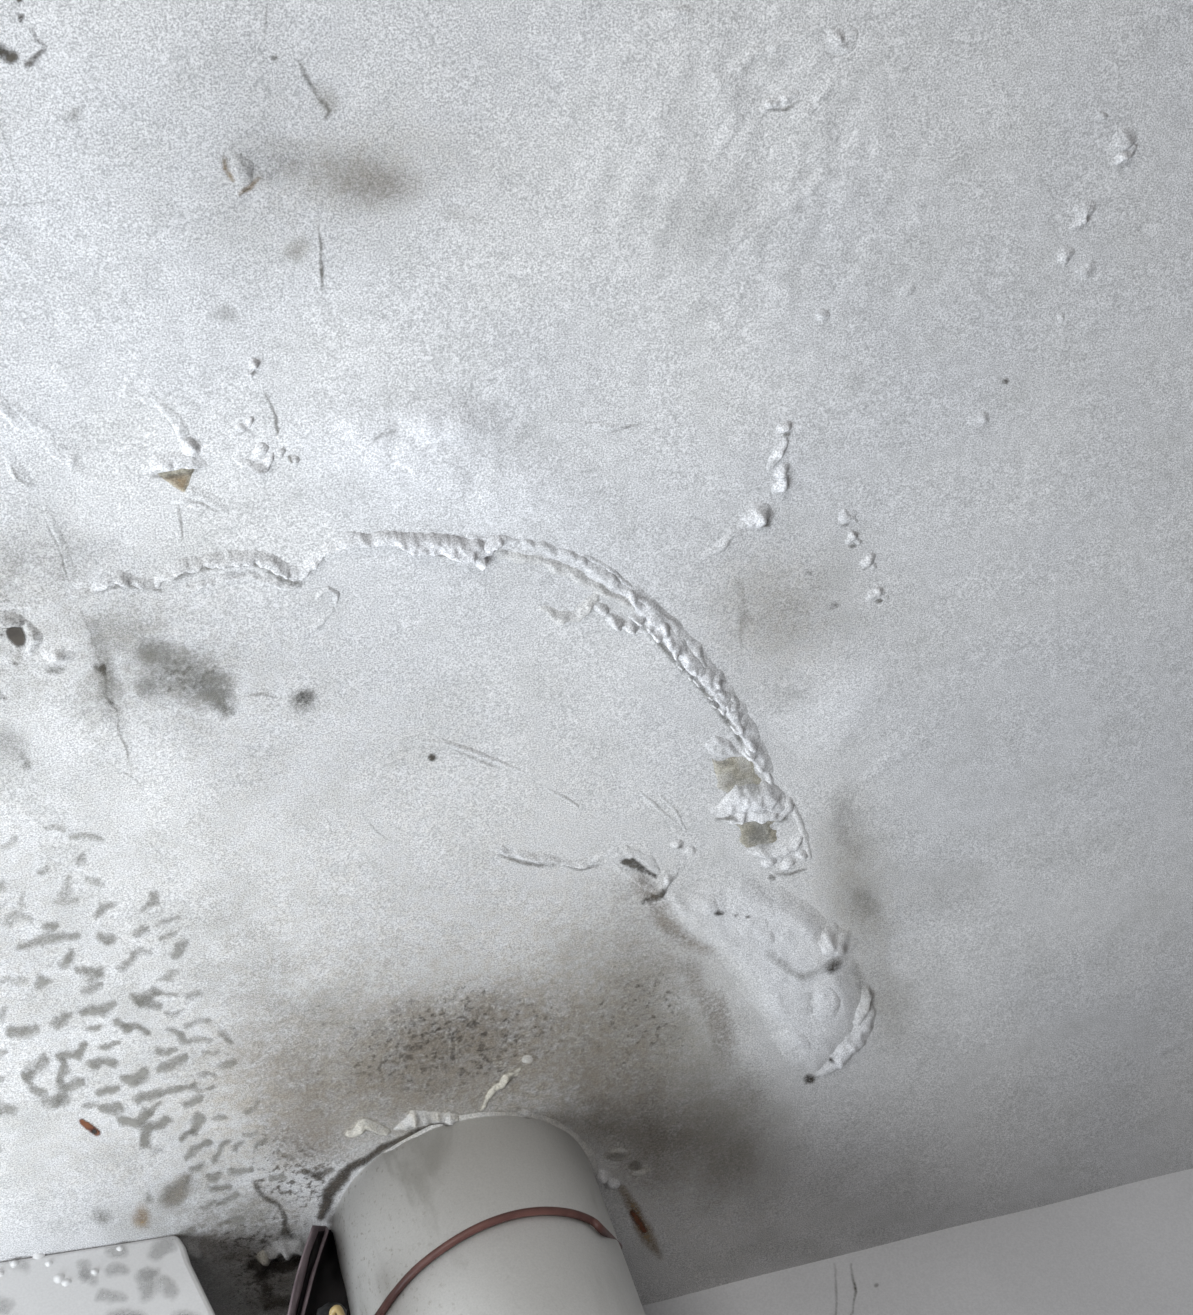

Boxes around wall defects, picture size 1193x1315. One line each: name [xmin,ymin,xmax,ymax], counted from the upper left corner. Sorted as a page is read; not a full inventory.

peeling [246,358,260,378]
spalling [142,393,230,517]
peeling [232,414,300,476]
crack [414,738,579,808]
crack [637,789,697,856]
crack [489,844,620,869]
leakage [17,924,101,986]
leakage [131,990,171,1009]
leakage [7,1027,37,1037]
leakage [355,1014,518,1082]
leakage [21,1003,333,1303]